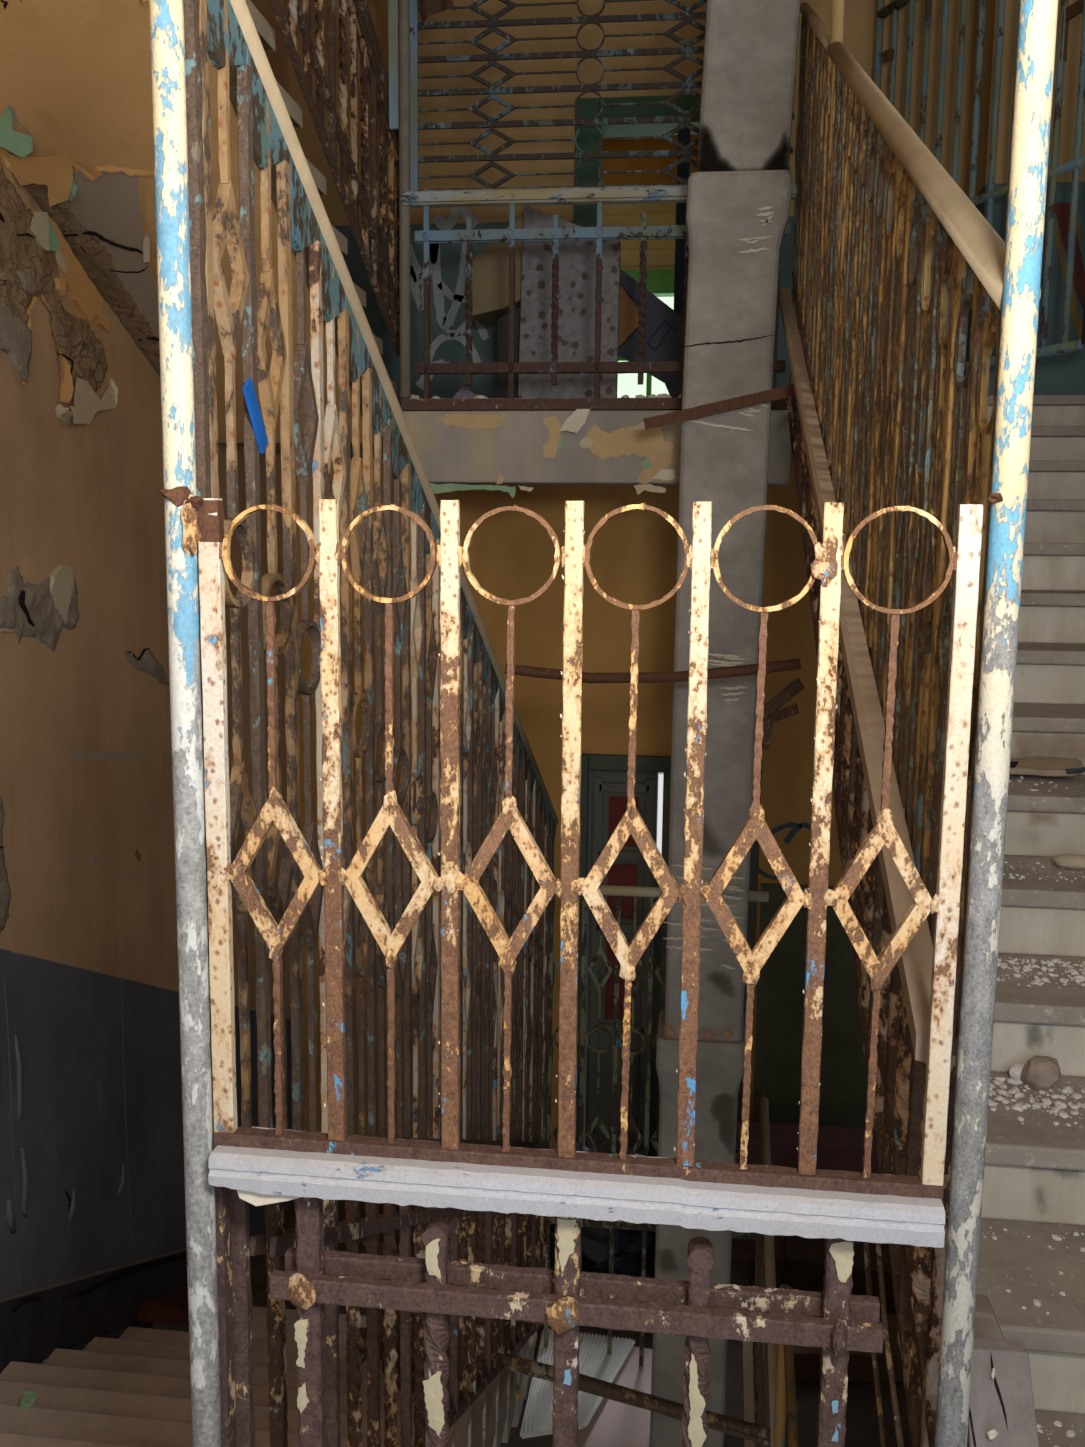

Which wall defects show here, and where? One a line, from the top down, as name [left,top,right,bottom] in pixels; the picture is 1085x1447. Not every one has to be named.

flaking render [0,104,160,426]
peeling [438,413,505,430]
peeling [430,473,534,498]
peeling [542,409,676,495]
spalling [0,566,79,651]
spalling [0,796,11,933]